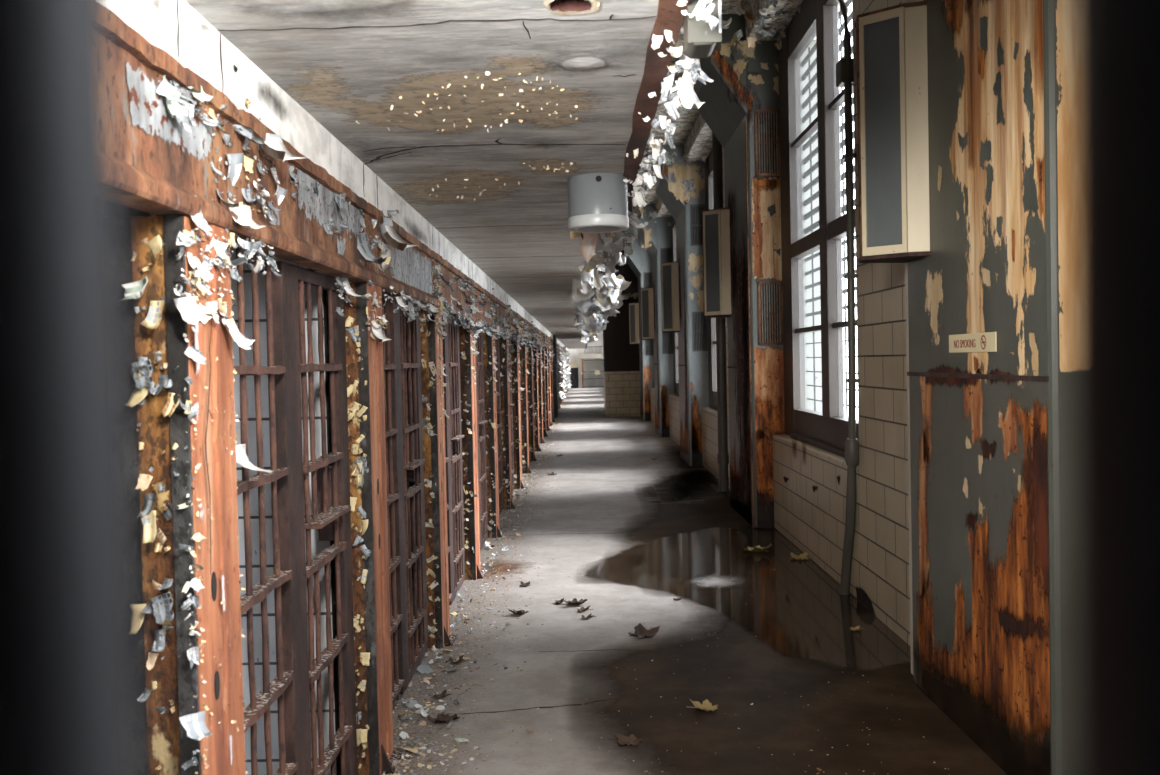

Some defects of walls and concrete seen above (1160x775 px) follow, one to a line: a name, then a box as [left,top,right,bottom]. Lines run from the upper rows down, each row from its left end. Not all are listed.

crack [218,14,656,93]
peeling [283,54,611,135]
spalling [542,0,600,15]
peeling [567,0,800,344]
peeling [938,0,1068,388]
rust [728,176,785,528]
peeling [925,269,944,346]
peeling [122,62,583,774]
damp [619,449,778,546]
peeling [962,436,991,517]
damp [578,608,1050,775]